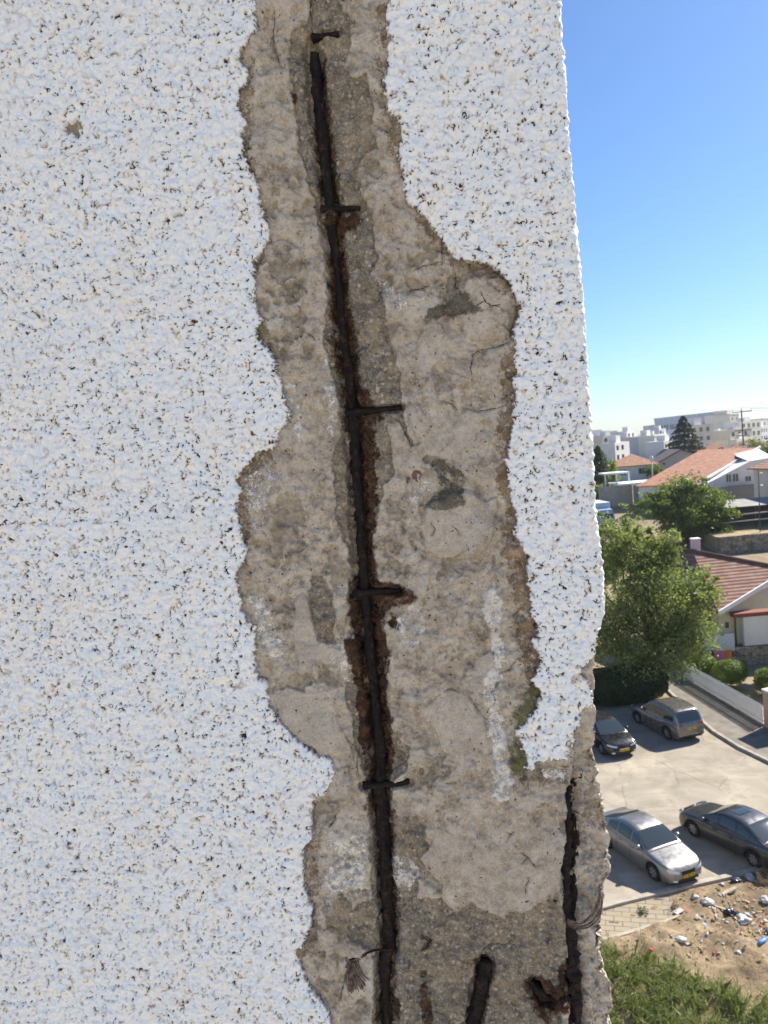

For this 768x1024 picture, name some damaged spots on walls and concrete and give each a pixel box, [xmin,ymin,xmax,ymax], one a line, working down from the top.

corrosion [312,57,417,1023]
spalling [236,0,613,1024]
corrosion [462,953,492,1021]